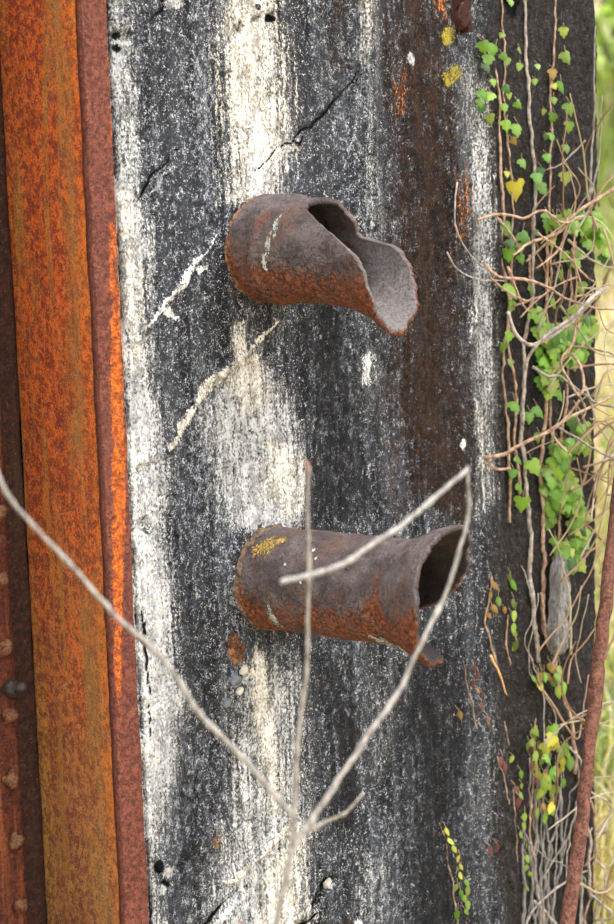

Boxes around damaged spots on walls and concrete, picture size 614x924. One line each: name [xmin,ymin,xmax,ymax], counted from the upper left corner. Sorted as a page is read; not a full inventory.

spalling [164,0,183,9]
crack [255,69,372,178]
crack [137,149,179,202]
rust [370,0,490,527]
crack [204,888,238,924]